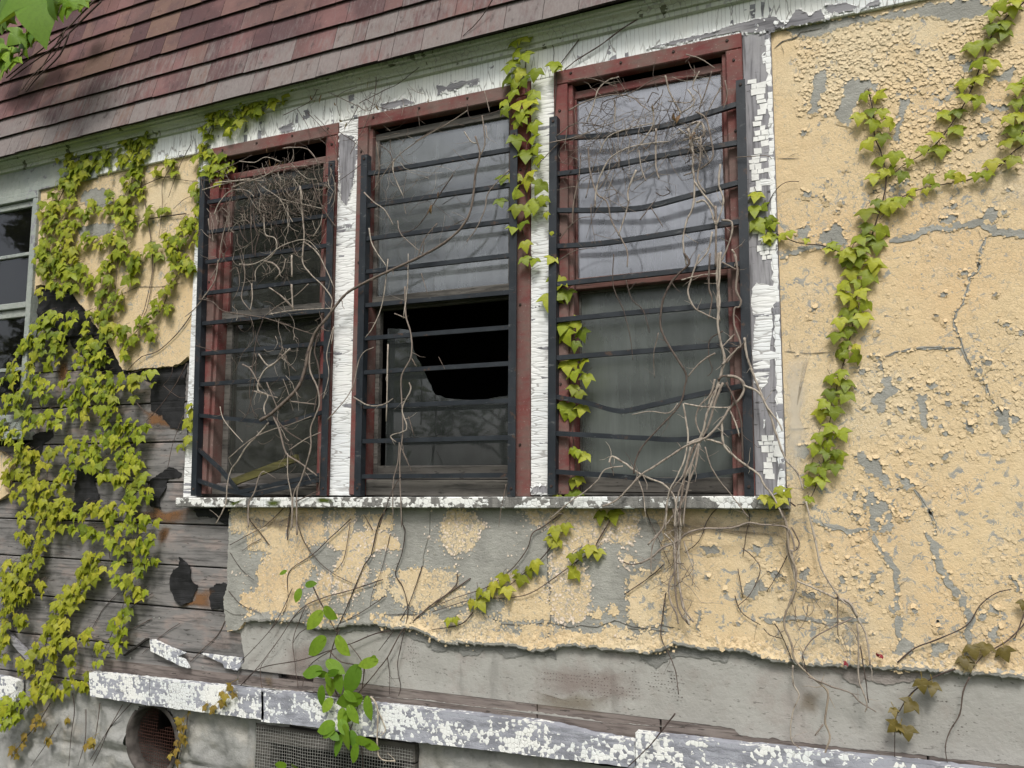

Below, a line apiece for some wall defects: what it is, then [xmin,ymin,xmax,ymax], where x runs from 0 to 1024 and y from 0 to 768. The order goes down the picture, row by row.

peeling [435,77,480,96]
peeling [646,0,1024,228]
peeling [79,186,113,208]
peeling [76,221,116,239]
peeling [752,229,776,260]
crack [780,240,848,259]
peeling [793,178,851,251]
crack [885,218,1024,415]
peeling [722,314,1024,687]
peeling [223,483,763,668]
crack [810,516,908,641]
crack [913,485,979,644]